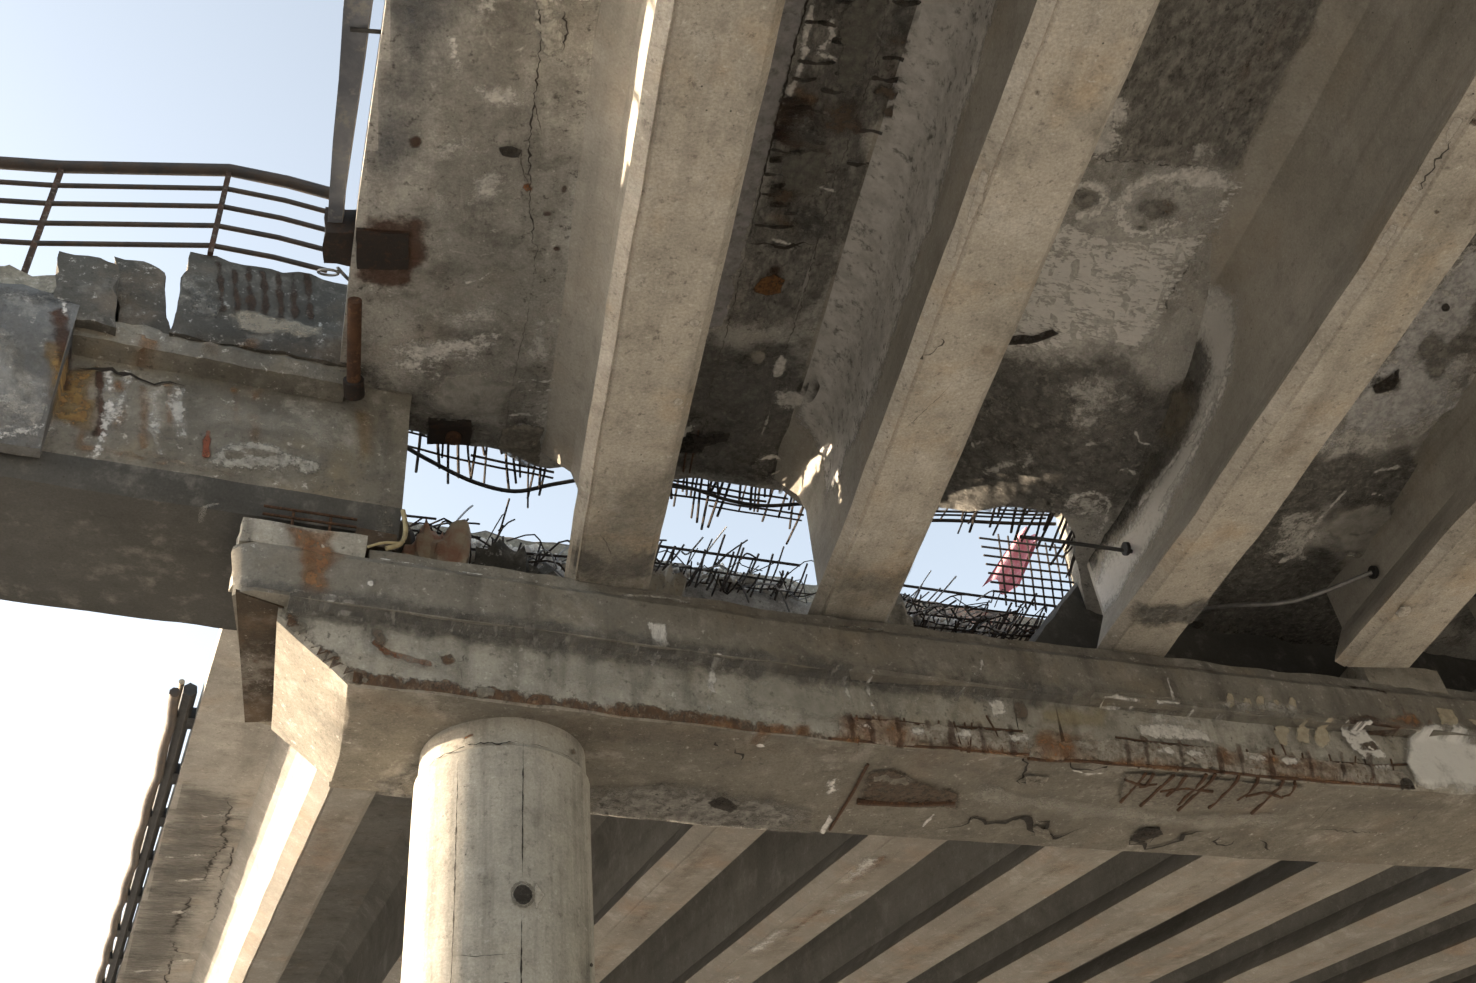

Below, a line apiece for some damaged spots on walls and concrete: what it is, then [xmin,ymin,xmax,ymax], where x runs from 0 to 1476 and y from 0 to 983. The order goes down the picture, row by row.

corrosion [356,219,427,286]
crack [506,9,542,427]
corrosion [47,303,123,449]
crack [80,367,184,386]
corrosion [290,527,334,592]
spalling [400,424,570,577]
spalling [653,425,816,612]
spalling [900,507,1076,641]
damp [1133,234,1476,648]
spalling [286,613,1416,850]
crack [941,700,1108,840]
crack [164,797,234,983]